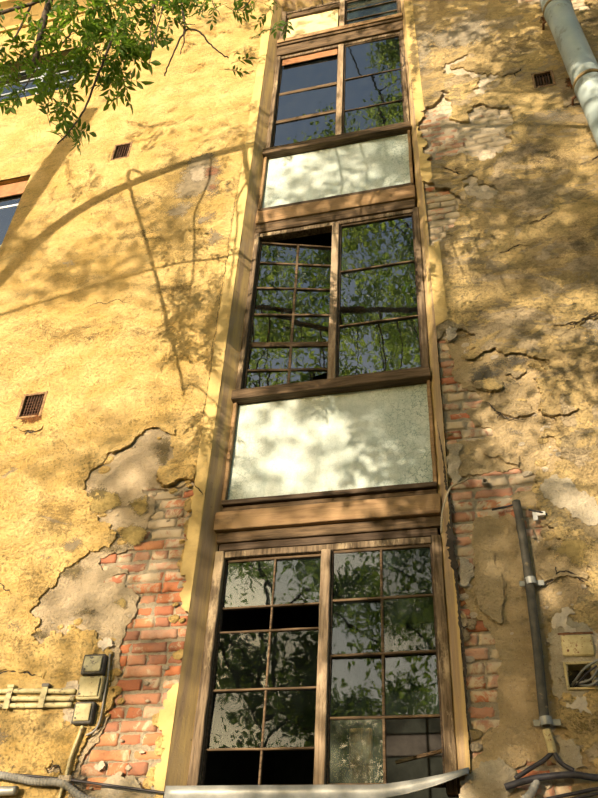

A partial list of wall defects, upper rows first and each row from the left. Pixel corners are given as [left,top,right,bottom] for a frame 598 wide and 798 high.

spalling [418,92,513,161]
peeling [165,152,230,217]
peeling [198,213,223,245]
spalling [423,176,498,246]
crack [553,308,598,329]
flaking render [581,319,598,345]
rust [21,414,42,424]
spalling [437,326,597,798]
spalling [31,420,196,794]
crack [0,662,46,679]